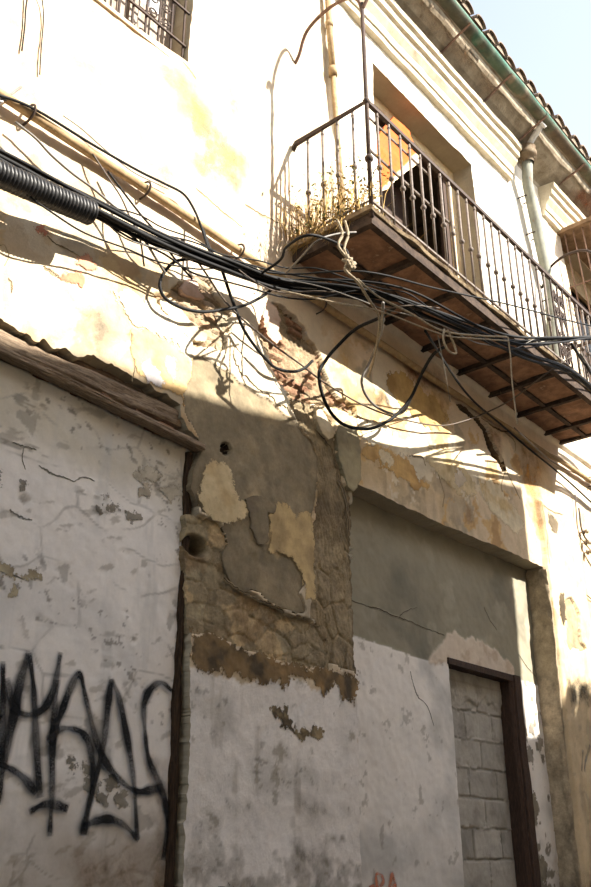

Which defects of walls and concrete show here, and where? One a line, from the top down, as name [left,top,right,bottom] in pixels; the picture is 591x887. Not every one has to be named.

peeling [60,253,97,288]
peeling [386,371,504,472]
crack [13,442,95,482]
flaking render [111,276,430,706]
peeling [426,443,525,536]
crack [9,509,32,520]
peeling [548,513,559,533]
crack [352,600,444,636]
flaking render [559,593,585,651]
peeling [269,703,325,742]